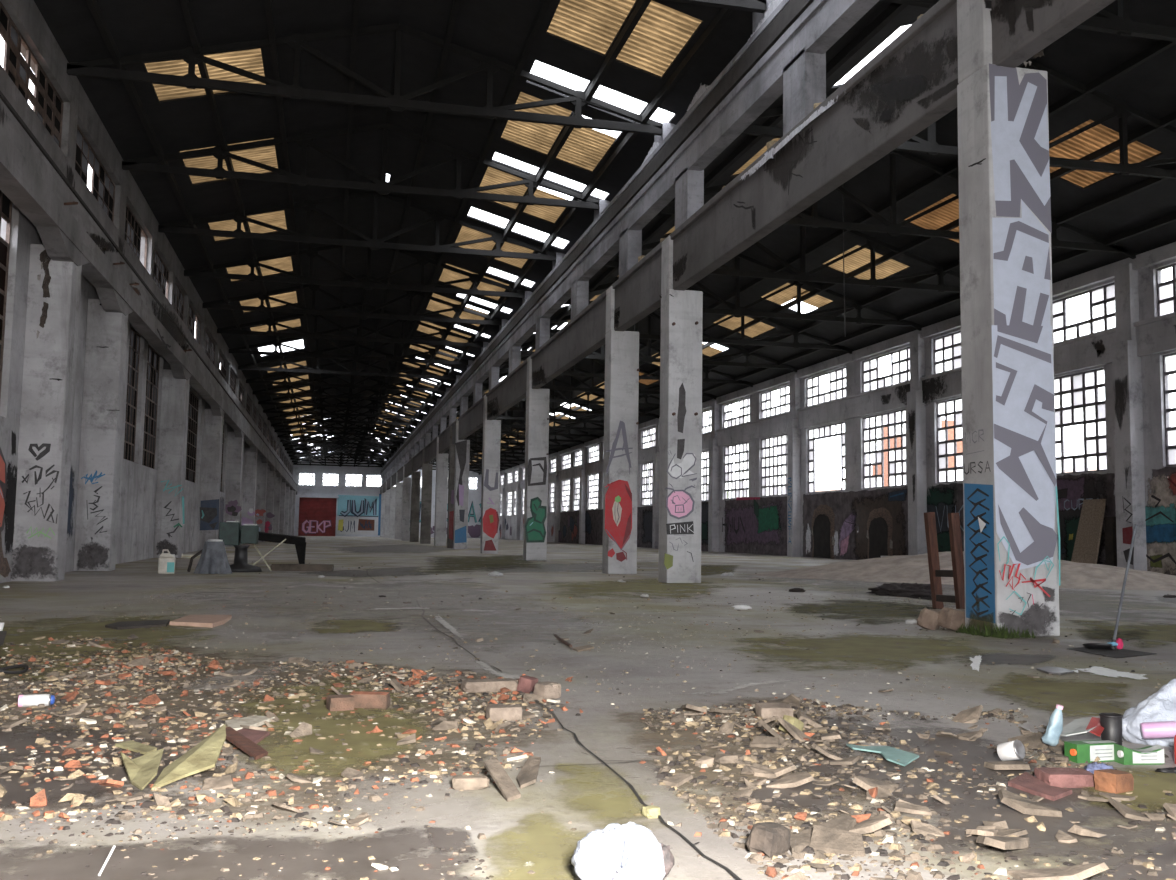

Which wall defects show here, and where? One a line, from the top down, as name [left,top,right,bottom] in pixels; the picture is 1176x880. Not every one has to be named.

leakage [984,0,1052,35]
leakage [843,36,959,132]
spalling [37,250,51,338]
leakage [11,545,56,579]
leakage [77,538,109,570]
leakage [999,586,1057,636]
crack [367,568,742,880]